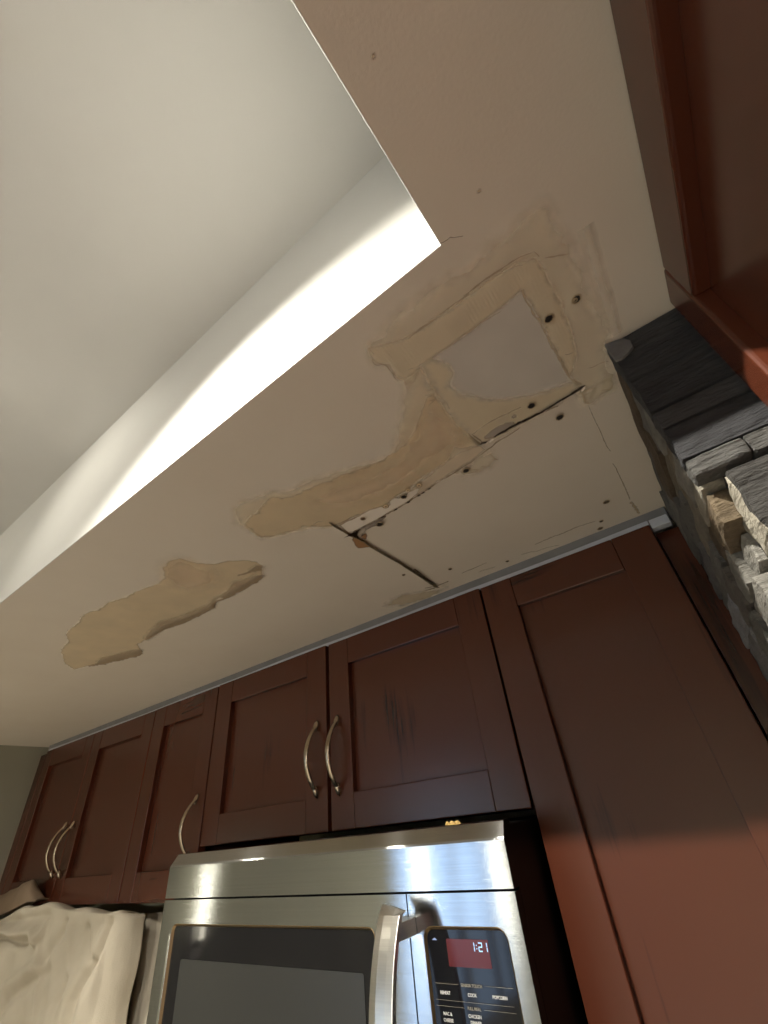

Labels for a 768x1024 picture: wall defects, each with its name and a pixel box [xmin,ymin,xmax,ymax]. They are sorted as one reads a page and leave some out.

peeling [338,447,483,532]
crack [329,353,640,591]
peeling [89,566,263,667]